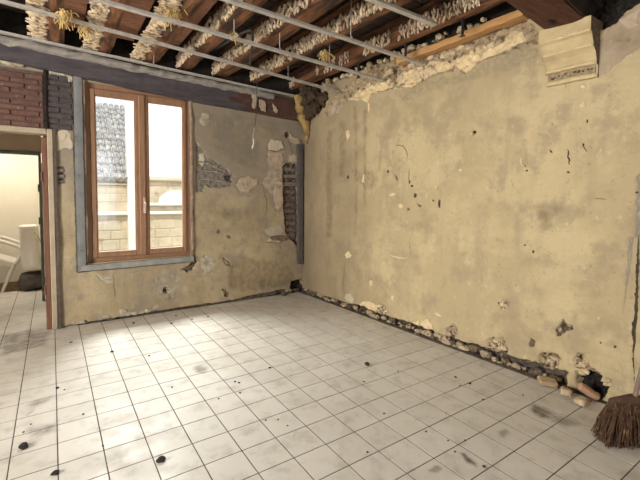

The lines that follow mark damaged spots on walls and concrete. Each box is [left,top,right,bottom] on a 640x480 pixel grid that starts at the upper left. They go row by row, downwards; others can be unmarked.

flaking render [196,131,302,250]
flaking render [183,255,231,274]
flaking render [64,279,613,401]